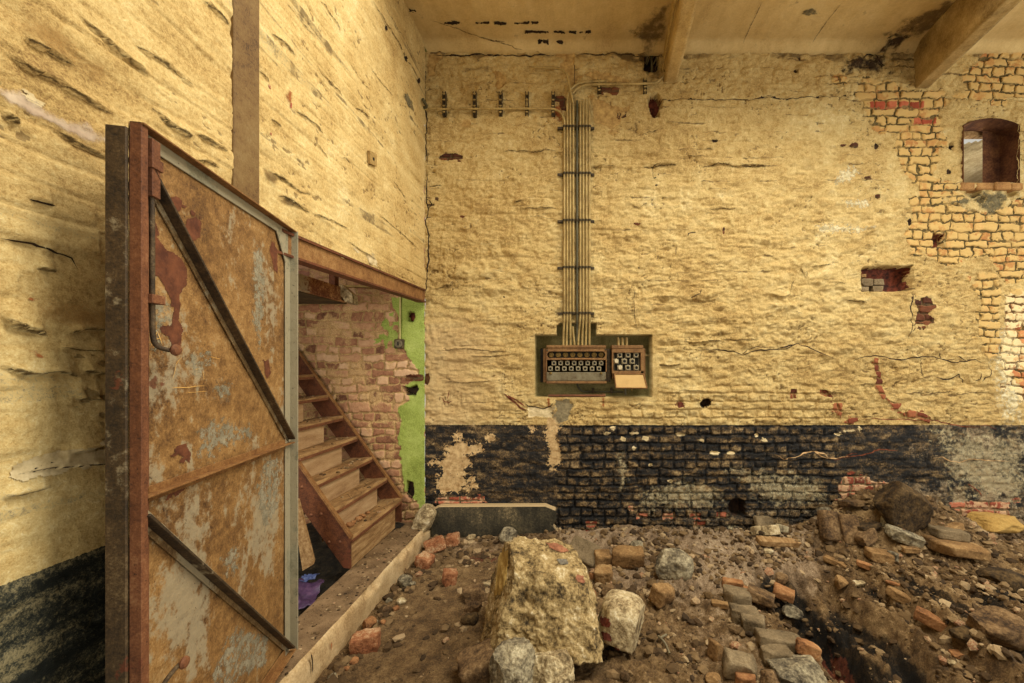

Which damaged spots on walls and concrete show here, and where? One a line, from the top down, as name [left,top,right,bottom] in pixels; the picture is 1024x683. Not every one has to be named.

spalling [475,21,591,45]
damp [636,8,667,76]
damp [842,2,953,74]
flaking render [831,52,1024,401]
crack [684,296,992,393]
flaking render [405,373,430,396]
spalling [871,358,931,423]
peeling [9,440,105,482]
peeling [428,430,496,504]